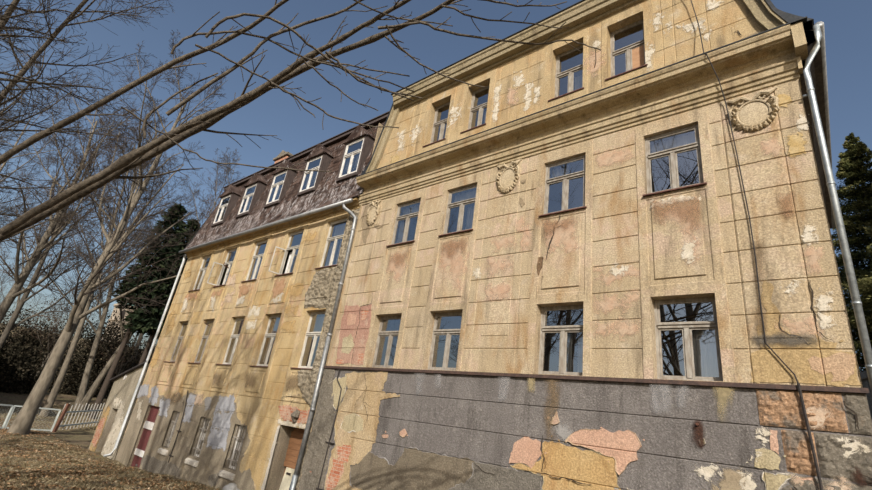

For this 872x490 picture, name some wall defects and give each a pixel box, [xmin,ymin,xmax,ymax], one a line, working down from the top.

flaking render [492,71,541,122]
flaking render [761,114,810,158]
flaking render [650,195,701,265]
flaking render [750,225,862,387]
spalling [89,204,645,490]
rust [694,420,706,447]
flaking render [694,427,850,490]
flaking render [801,406,830,428]
flaking render [836,437,871,458]